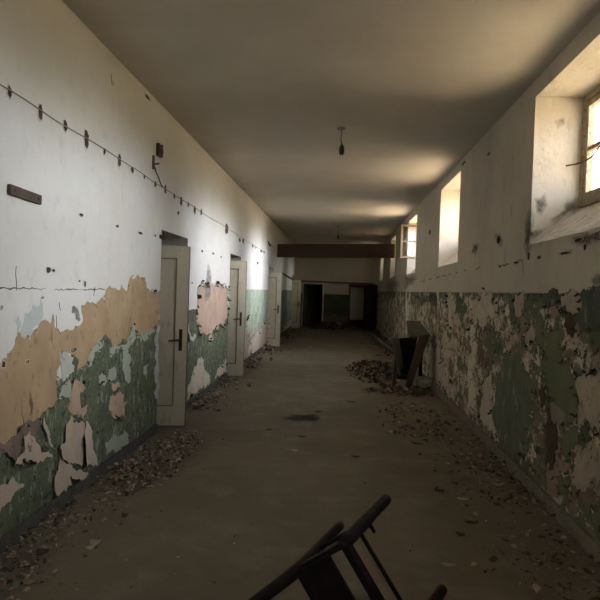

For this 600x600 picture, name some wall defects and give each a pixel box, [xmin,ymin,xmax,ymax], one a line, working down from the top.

crack [0,272,106,334]
peeling [188,280,231,345]
peeling [246,315,270,356]
peeling [542,285,600,358]
peeling [0,275,162,500]
peeling [187,357,228,400]
peeling [466,287,558,480]
peeling [569,368,600,436]
peeling [0,477,24,511]
peeling [563,442,600,498]